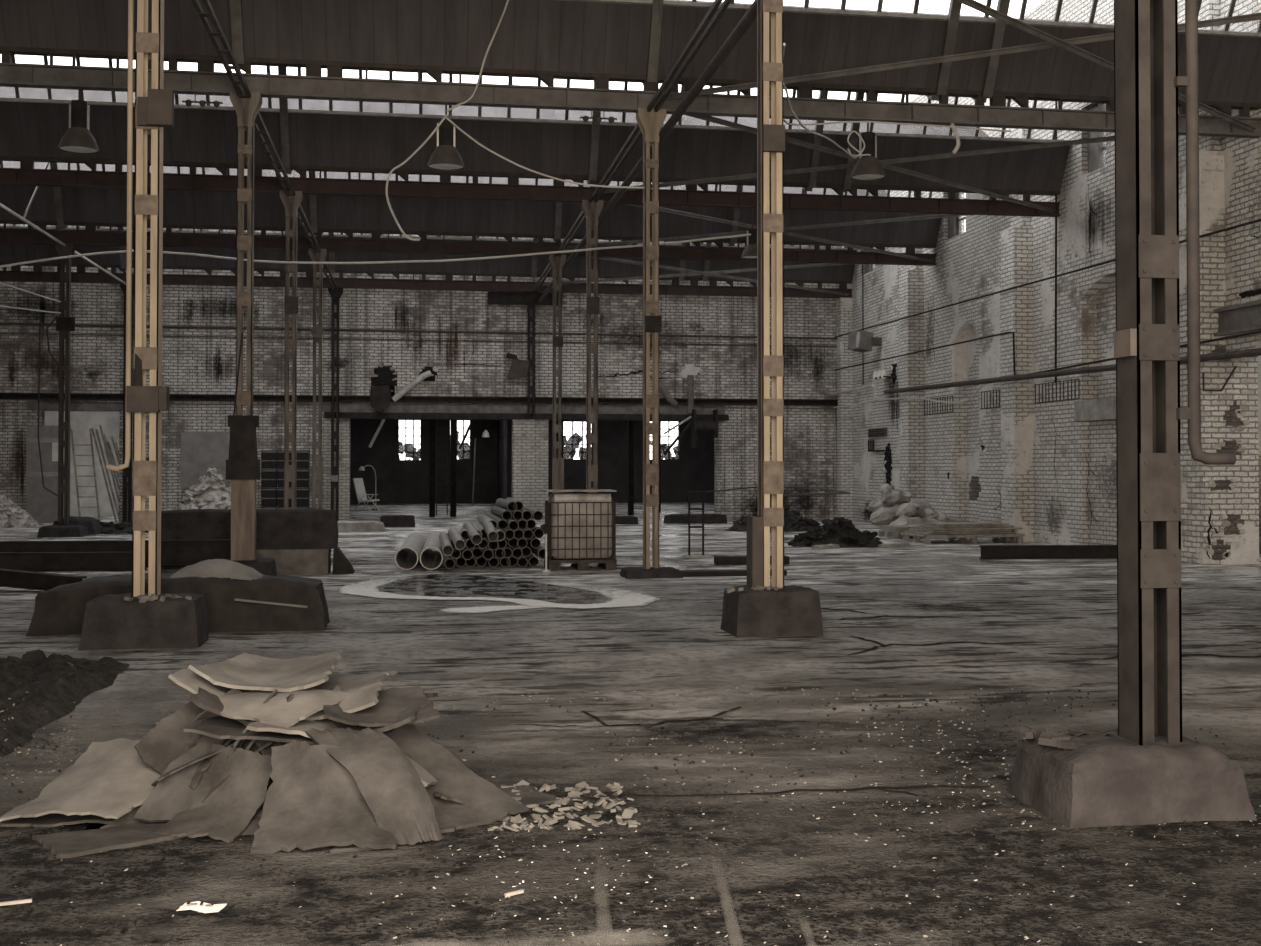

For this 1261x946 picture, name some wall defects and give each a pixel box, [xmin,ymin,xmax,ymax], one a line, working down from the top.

spalling [1212,400,1250,455]
spalling [1208,479,1237,491]
spalling [1205,514,1246,560]